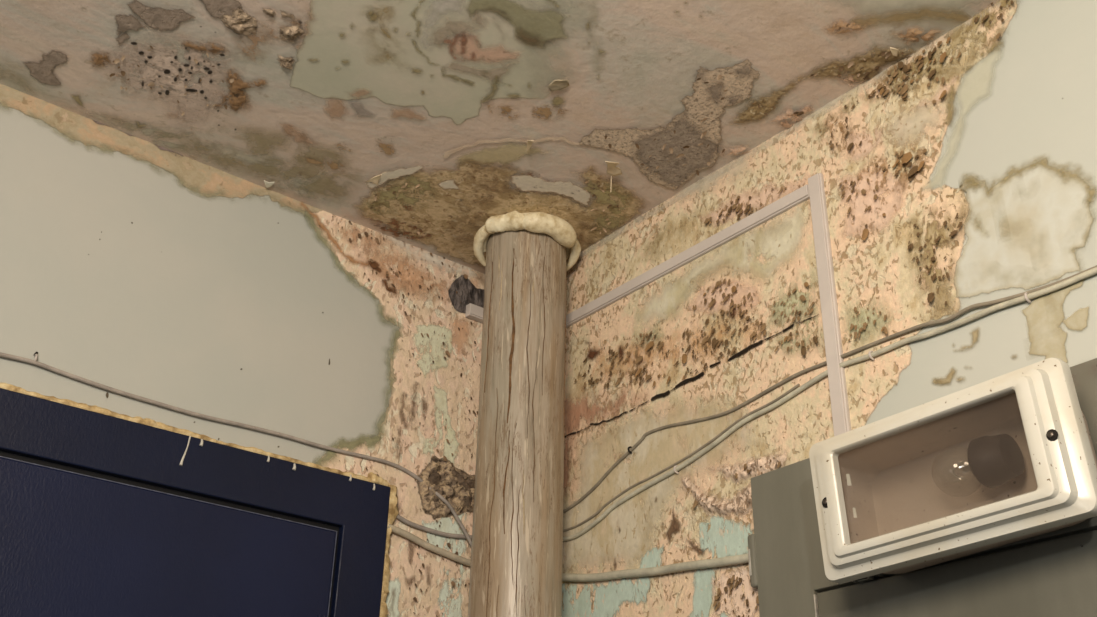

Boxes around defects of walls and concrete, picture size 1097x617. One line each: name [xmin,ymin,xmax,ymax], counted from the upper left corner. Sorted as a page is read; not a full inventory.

spalling [24,50,67,86]
spalling [92,0,304,131]
damp [368,0,566,103]
damp [734,0,1013,142]
peeling [0,84,485,617]
damp [359,144,642,267]
crack [564,314,819,438]
peeling [443,0,1017,617]
damp [858,152,923,185]
damp [933,368,962,385]
damp [914,159,1096,363]